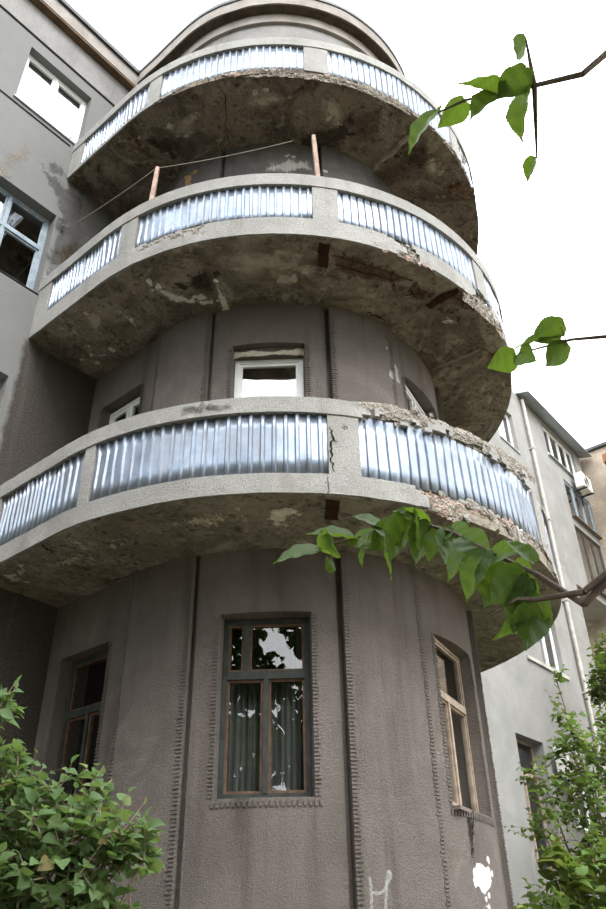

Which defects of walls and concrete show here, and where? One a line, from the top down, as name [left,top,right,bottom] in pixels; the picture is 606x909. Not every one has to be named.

spalling [229,68,411,116]
spalling [447,185,476,201]
corrosion [317,242,330,269]
spalling [342,401,539,486]
peeling [265,508,313,545]
corrosion [324,499,340,520]
spalling [415,488,550,559]